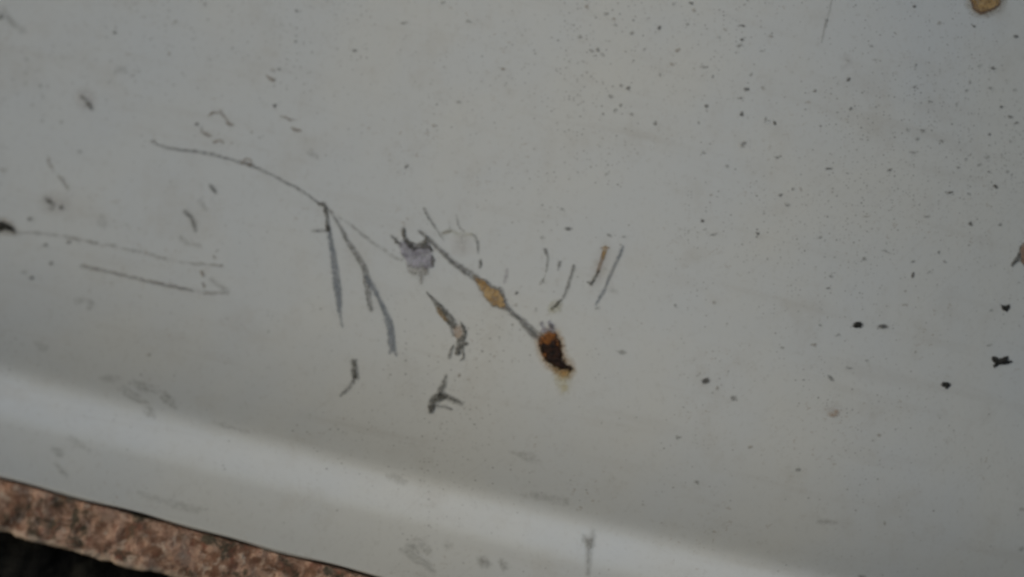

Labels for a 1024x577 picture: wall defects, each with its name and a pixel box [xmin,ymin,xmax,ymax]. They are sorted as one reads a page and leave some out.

peeling [392,229,435,269]
rust [539,321,572,375]